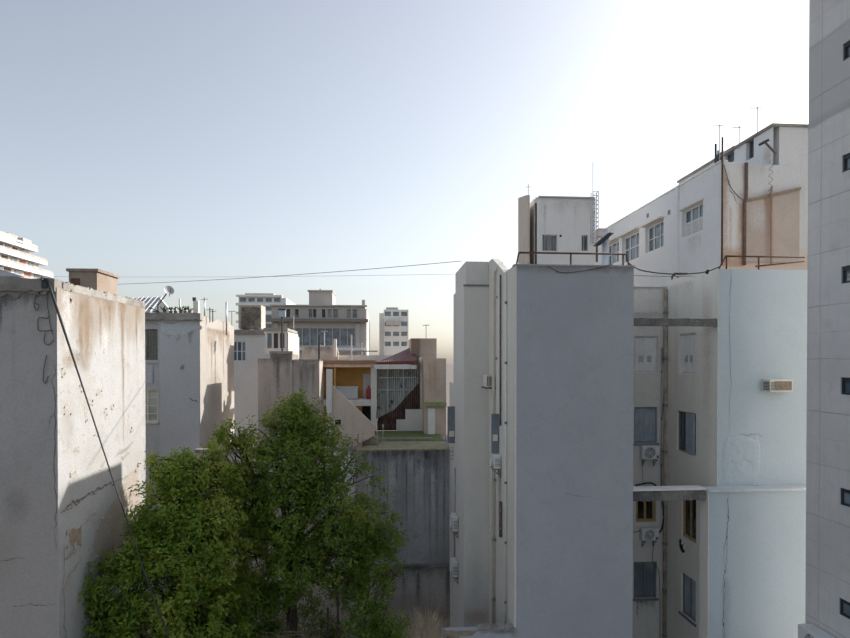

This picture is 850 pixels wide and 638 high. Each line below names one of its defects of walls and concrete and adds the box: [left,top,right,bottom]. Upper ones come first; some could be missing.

leakage [59,281,140,448]
crack [12,365,127,638]
crack [722,496,730,637]